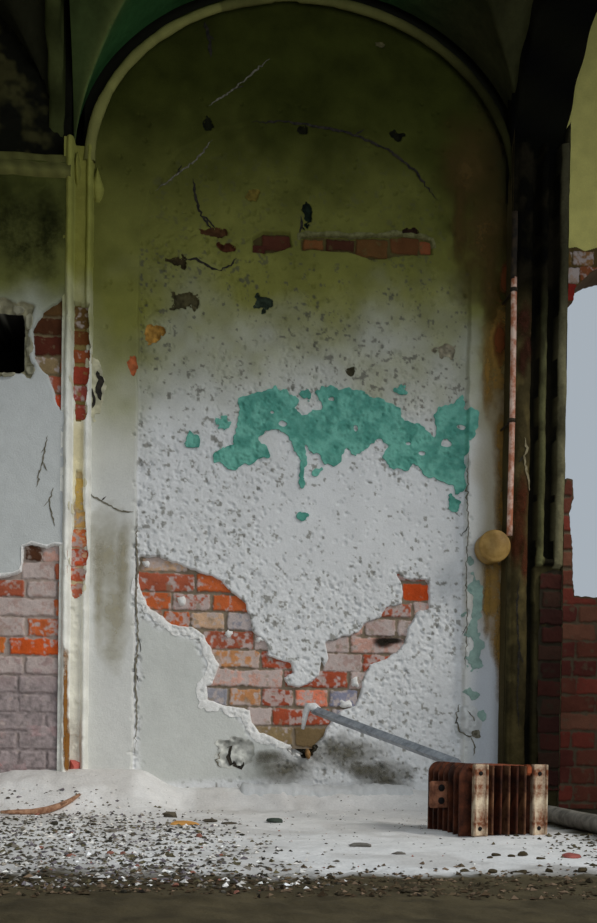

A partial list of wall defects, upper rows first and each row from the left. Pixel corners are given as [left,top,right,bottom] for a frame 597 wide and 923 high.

crack [209,59,269,106]
flaking render [252,202,436,260]
flaking render [0,298,107,422]
crack [36,435,55,526]
peeling [184,430,200,448]
peeling [213,367,479,512]
flaking render [0,472,88,773]
flaking render [130,557,429,770]